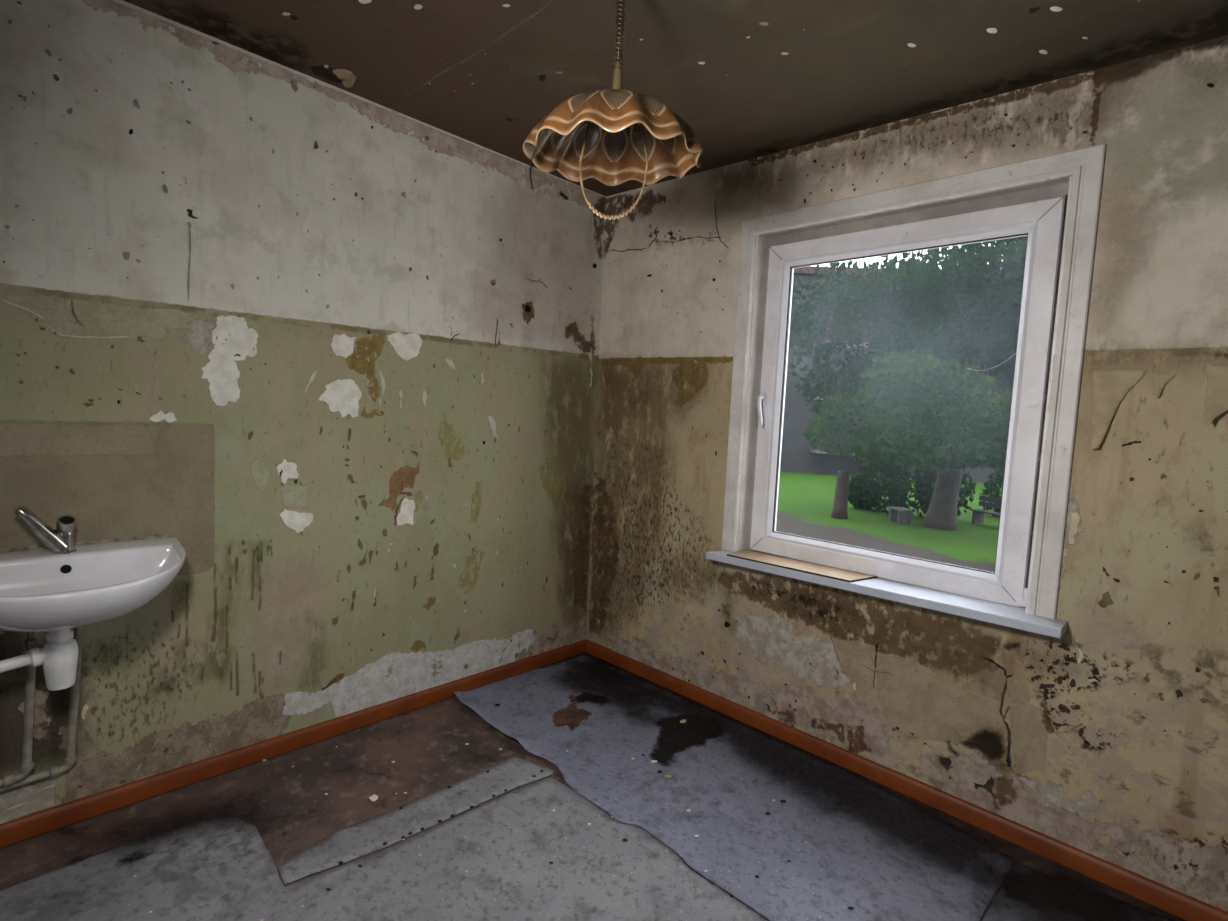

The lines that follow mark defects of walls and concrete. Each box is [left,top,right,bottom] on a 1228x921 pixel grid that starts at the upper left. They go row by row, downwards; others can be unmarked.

peeling [81,0,605,222]
leakage [749,8,1228,167]
leakage [594,190,666,258]
crack [610,227,727,277]
leakage [212,546,271,647]
leakage [572,473,620,633]
peeling [1098,568,1120,608]
peeling [0,564,587,824]
leakage [553,660,1169,921]
peeling [607,609,1228,912]
crack [981,657,1013,768]